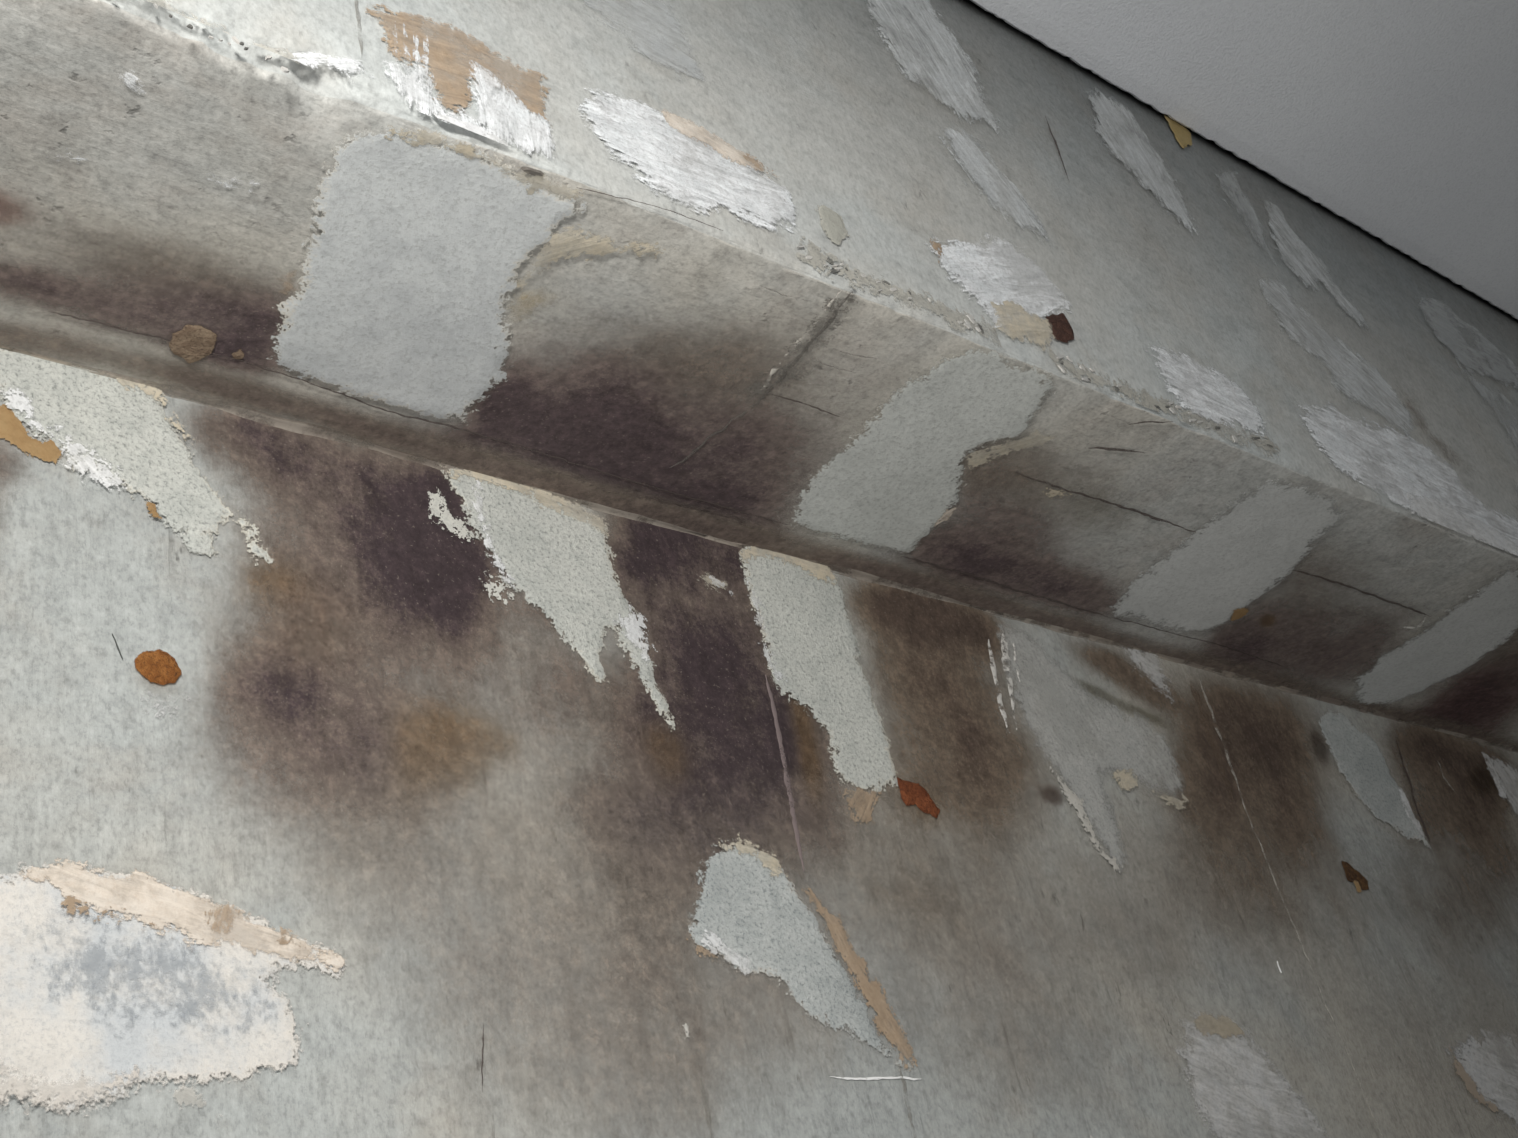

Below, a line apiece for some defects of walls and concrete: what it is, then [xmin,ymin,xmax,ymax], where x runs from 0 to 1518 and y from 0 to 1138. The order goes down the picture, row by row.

peeling [520,167,544,177]
crack [577,187,723,231]
crack [51,312,171,342]
rust [1046,313,1074,343]
crack [211,291,874,525]
peeling [0,388,127,491]
peeling [146,502,162,519]
rust [134,649,182,685]
leakage [0,262,1518,1092]
rust [897,778,940,819]